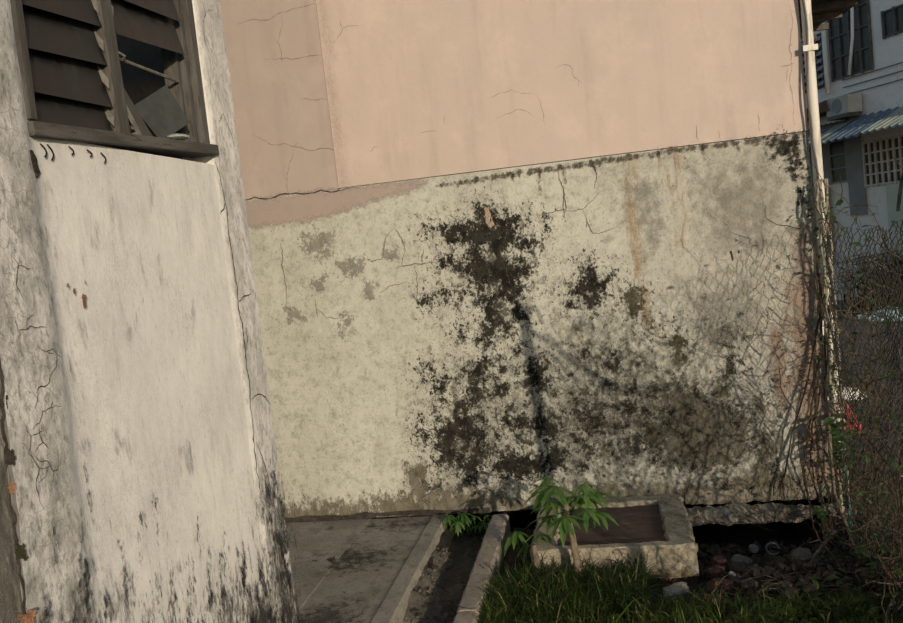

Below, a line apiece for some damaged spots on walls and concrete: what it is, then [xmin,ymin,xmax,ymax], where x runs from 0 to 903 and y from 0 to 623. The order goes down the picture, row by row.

leakage [0,461,22,623]
crack [0,259,62,615]
crack [216,96,358,495]
leakage [39,129,827,623]
spalling [685,479,834,505]